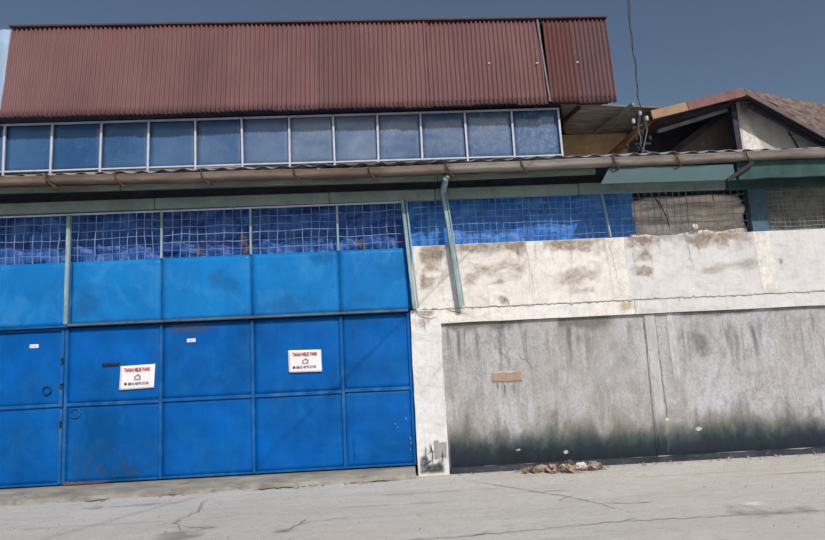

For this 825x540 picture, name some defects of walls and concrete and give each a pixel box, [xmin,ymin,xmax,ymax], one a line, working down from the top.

damp [688,234,711,246]
damp [446,320,523,383]
damp [559,316,606,327]
damp [666,313,681,381]
damp [449,413,825,467]